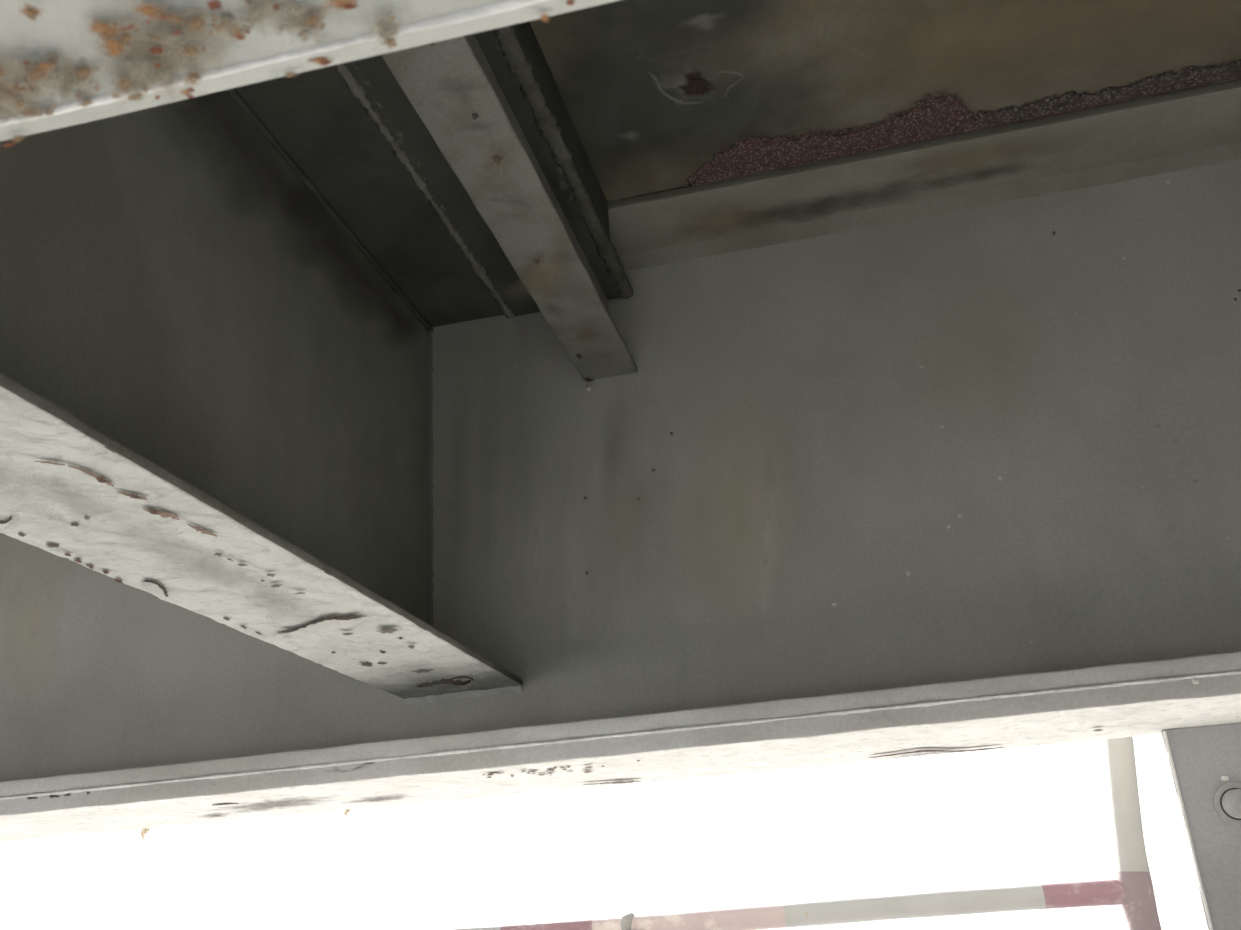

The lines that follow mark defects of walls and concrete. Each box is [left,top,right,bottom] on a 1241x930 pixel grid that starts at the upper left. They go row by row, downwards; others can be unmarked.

rust [374,10,400,47]
rust [0,0,357,119]
peeling [0,516,26,537]
spalling [47,543,123,583]
peeling [141,579,168,600]
peeling [277,615,365,639]
spalling [378,628,414,649]